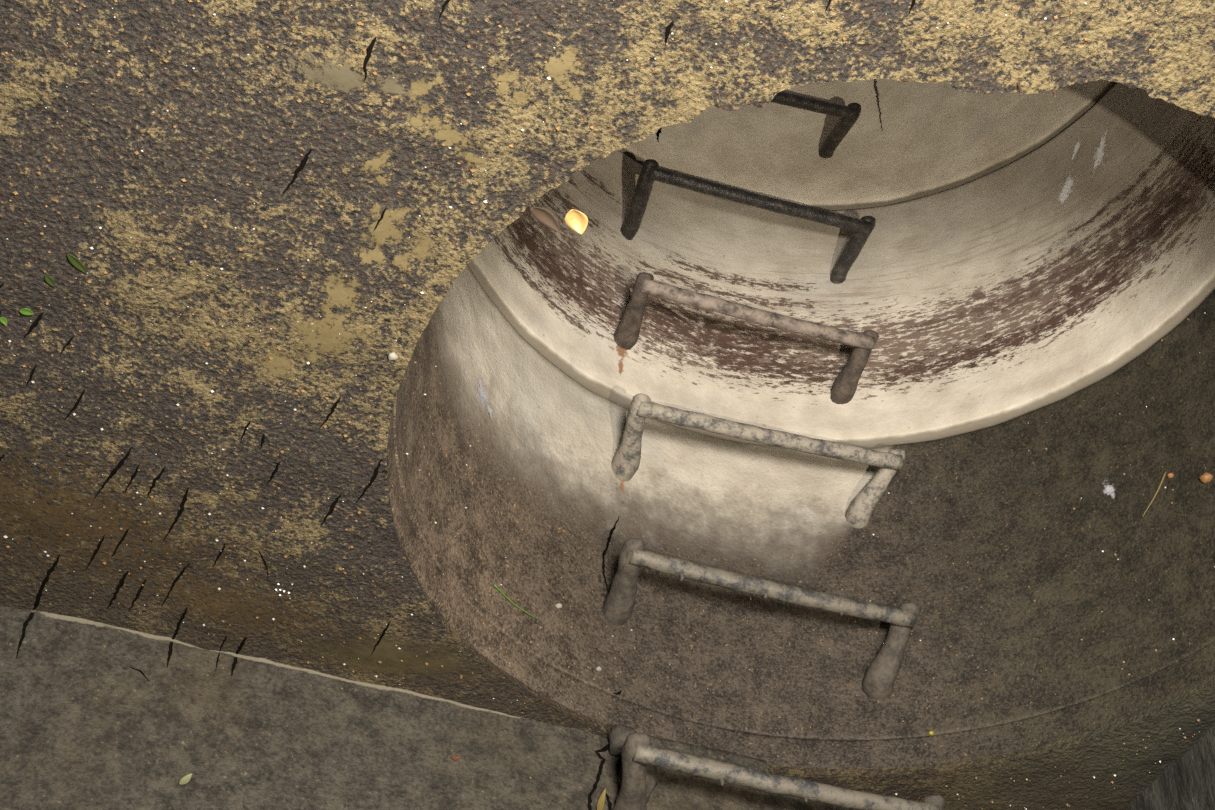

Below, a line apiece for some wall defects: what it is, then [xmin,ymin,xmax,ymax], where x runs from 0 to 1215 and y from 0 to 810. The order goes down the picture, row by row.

crack [874,79,883,130]
crack [282,149,312,196]
crack [24,312,44,338]
crack [26,336,74,387]
crack [94,447,166,499]
crack [163,488,189,541]
crack [16,529,226,681]
crack [587,743,612,810]